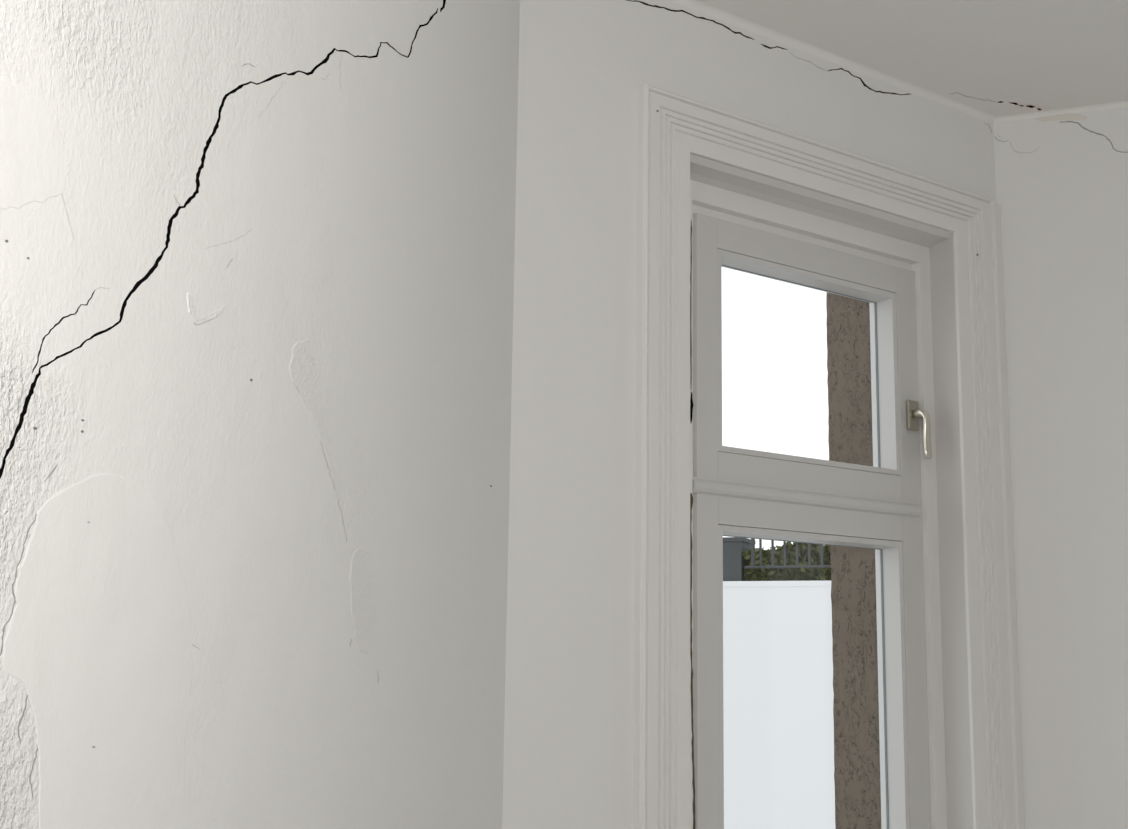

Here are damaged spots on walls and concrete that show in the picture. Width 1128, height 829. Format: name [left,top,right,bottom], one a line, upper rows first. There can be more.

crack [627,0,909,95]
crack [951,92,1128,154]
crack [0,0,446,478]
crack [0,514,37,656]
crack [17,695,38,799]